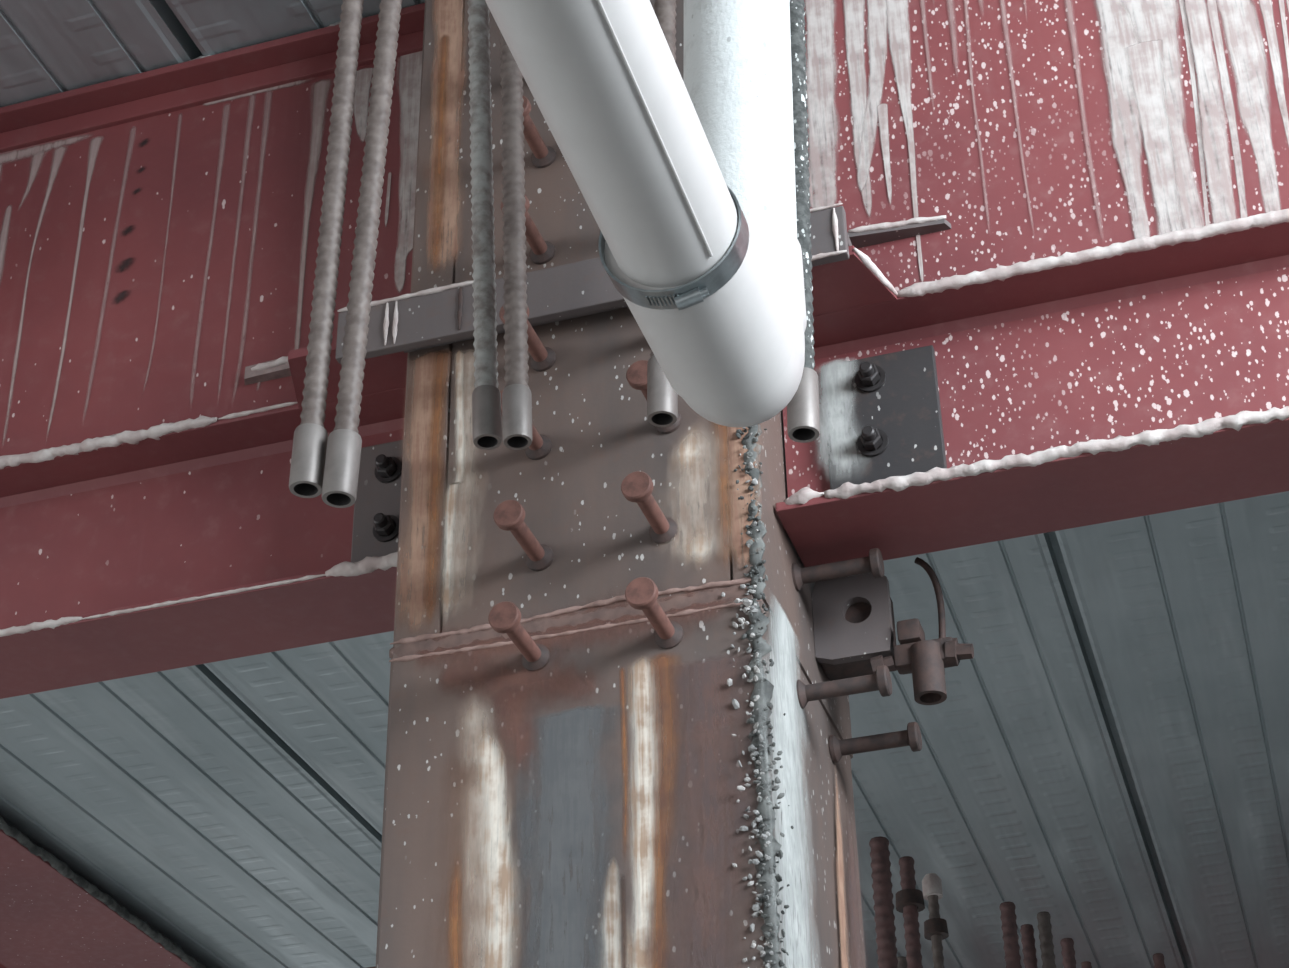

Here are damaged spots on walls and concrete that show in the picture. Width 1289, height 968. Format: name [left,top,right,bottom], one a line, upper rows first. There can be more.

damp [0,136,101,431]
damp [85,128,135,411]
damp [192,80,329,385]
corrosion [427,0,465,265]
damp [805,0,933,218]
damp [948,0,989,221]
damp [1001,0,1032,220]
damp [1066,0,1101,227]
damp [1096,0,1289,239]
corrosion [399,351,450,626]
damp [463,705,514,968]
damp [601,659,660,968]